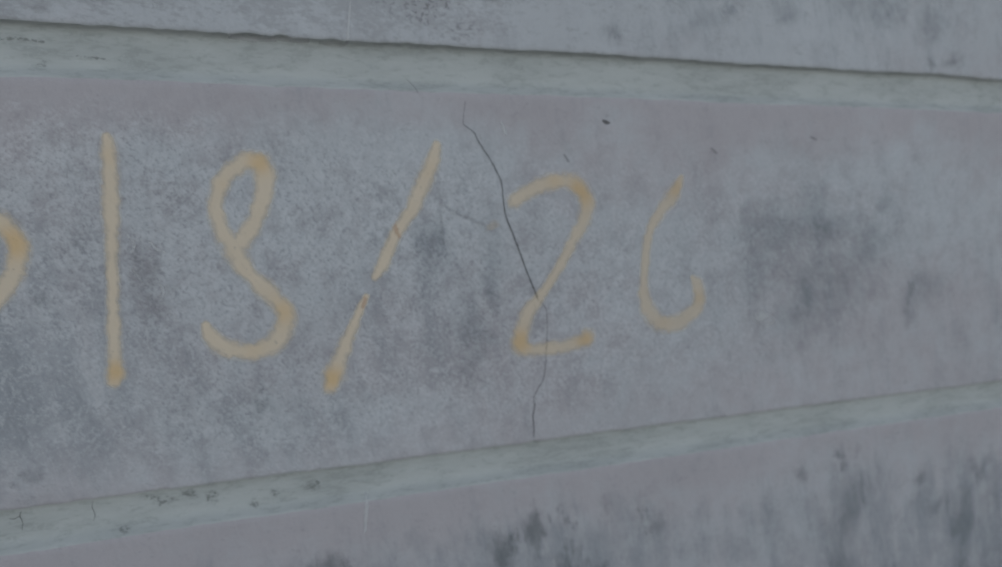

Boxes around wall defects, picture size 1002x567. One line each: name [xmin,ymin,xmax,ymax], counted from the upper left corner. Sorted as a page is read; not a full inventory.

crack [463,116,547,312]